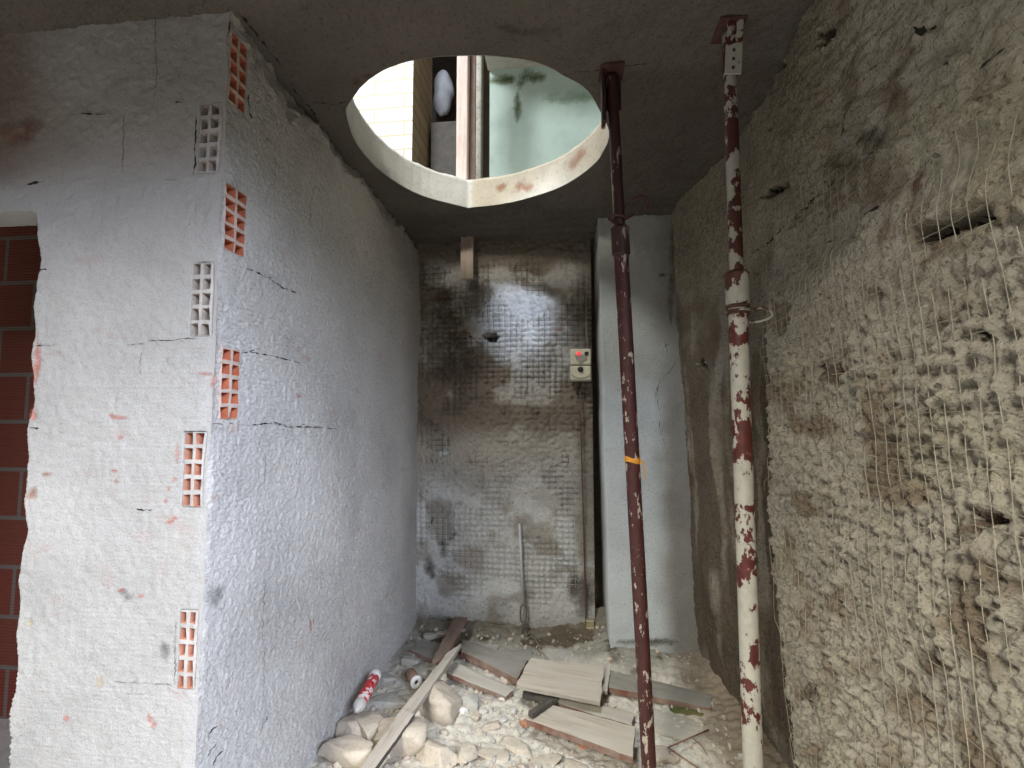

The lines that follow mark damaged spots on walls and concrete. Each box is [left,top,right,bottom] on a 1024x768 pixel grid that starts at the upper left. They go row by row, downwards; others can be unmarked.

crack [80,113,124,173]
crack [132,337,195,373]
spalling [815,362,845,381]
crack [213,422,340,430]
spalling [956,509,1012,532]
spalling [922,655,945,675]